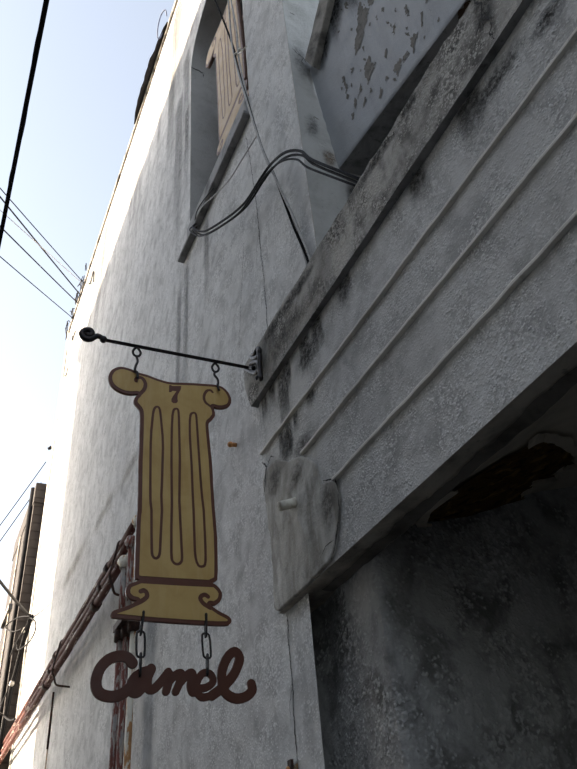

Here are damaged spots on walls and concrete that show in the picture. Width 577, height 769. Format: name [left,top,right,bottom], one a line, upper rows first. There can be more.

peeling [341,0,428,120]
damp [457,52,514,133]
damp [264,275,305,350]
damp [299,315,322,366]
damp [262,362,290,417]
damp [279,413,309,457]
spalling [322,367,577,592]
crack [287,619,297,752]